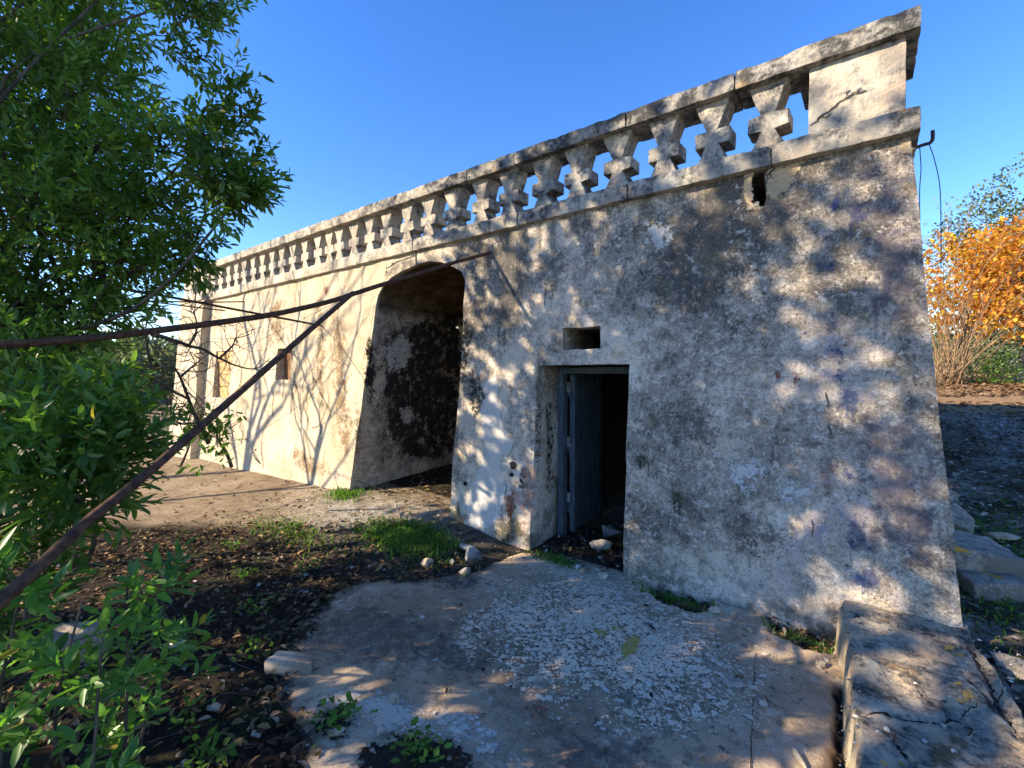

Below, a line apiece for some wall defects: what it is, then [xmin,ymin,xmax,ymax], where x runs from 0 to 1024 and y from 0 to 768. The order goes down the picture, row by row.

crack [810,88,866,126]
spalling [742,161,803,211]
water stain [312,298,463,467]
rust [505,492,516,522]
crack [850,647,1022,768]